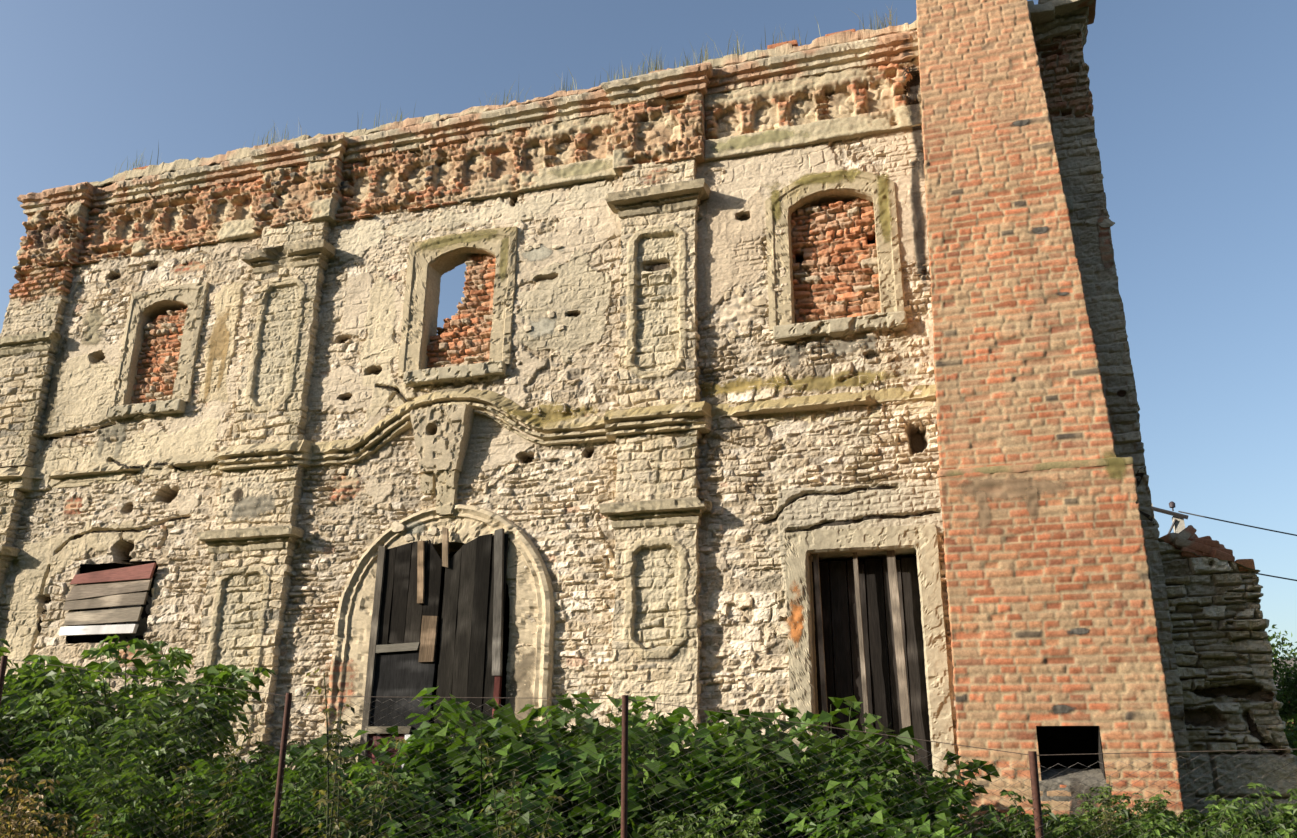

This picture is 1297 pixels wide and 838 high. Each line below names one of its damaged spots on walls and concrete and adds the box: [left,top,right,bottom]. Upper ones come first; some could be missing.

spalling [644,165,679,184]
leakage [771,190,781,220]
leakage [877,174,892,241]
leakage [204,313,230,400]
spalling [317,660,354,734]